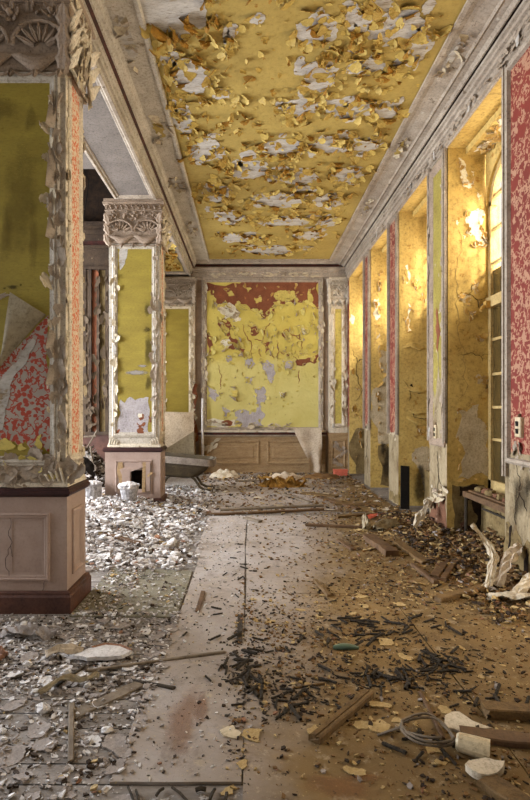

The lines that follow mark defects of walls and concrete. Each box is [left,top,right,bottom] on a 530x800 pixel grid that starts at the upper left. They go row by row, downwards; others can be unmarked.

peeling [0,89,85,488]
peeling [76,0,93,110]
peeling [83,233,183,435]
crack [243,320,303,384]
peeling [113,0,469,257]
peeling [188,270,399,504]
peeling [403,255,489,535]
peeling [456,158,488,248]
crack [514,465,527,524]